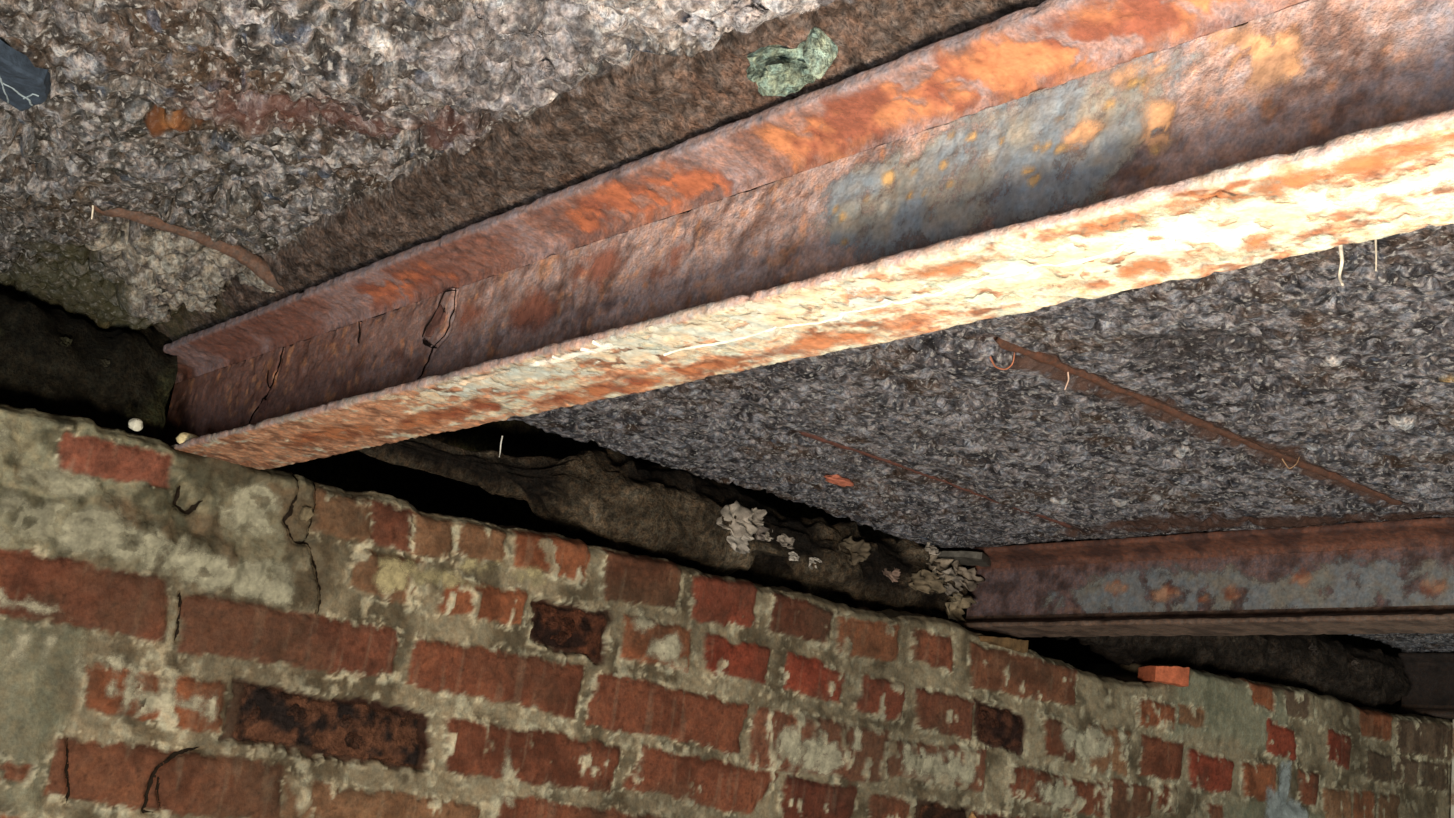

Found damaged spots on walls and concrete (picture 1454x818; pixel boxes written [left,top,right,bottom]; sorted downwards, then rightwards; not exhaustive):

rust [760,0,1220,169]
rust [1218,31,1301,91]
rust [567,170,732,233]
rust [1066,136,1454,238]
rust [919,261,981,278]
rust [1117,258,1186,278]
crack [417,288,456,380]
rust [1013,351,1454,537]
crack [173,486,203,515]
crack [282,473,321,613]
crack [63,738,71,805]
crack [141,747,199,813]